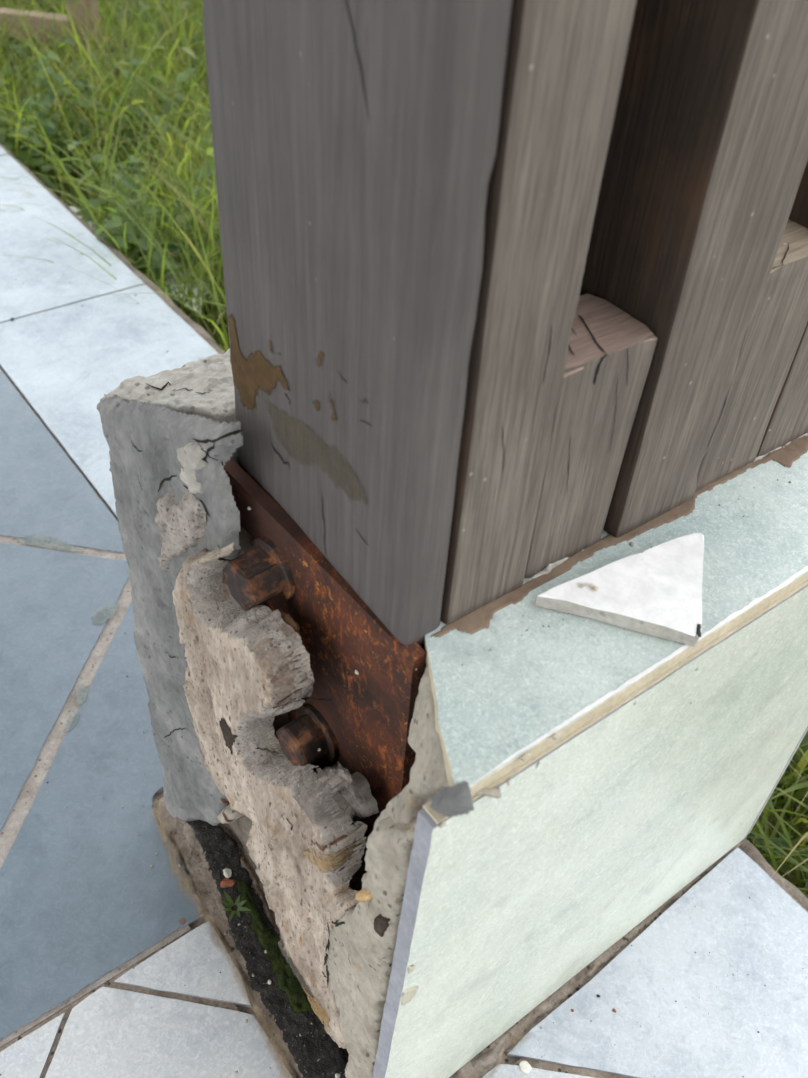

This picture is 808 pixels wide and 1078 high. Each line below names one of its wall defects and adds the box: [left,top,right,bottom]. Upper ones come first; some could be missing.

crack [345,0,369,120]
spalling [154,442,379,1049]
spalling [373,914,391,937]